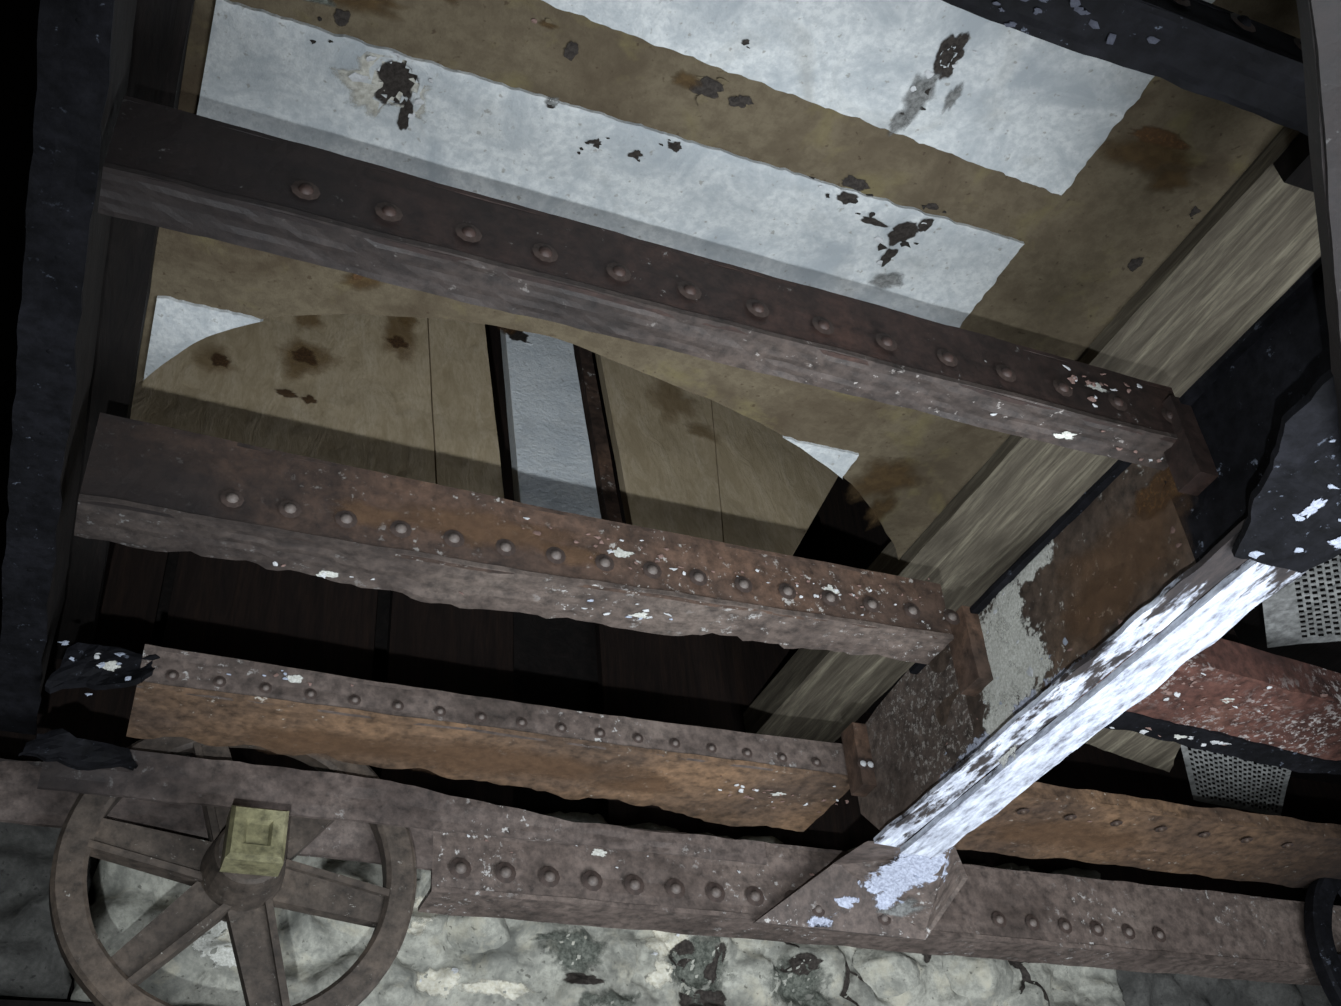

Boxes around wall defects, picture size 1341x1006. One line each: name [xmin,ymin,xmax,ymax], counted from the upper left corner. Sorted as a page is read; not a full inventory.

spalling [332,52,433,130]
peeling [890,33,977,135]
water stain [1104,127,1190,190]
peeling [809,175,946,288]
corrosion [795,574,882,616]
corrosion [1145,673,1289,721]
corrosion [1139,727,1230,747]